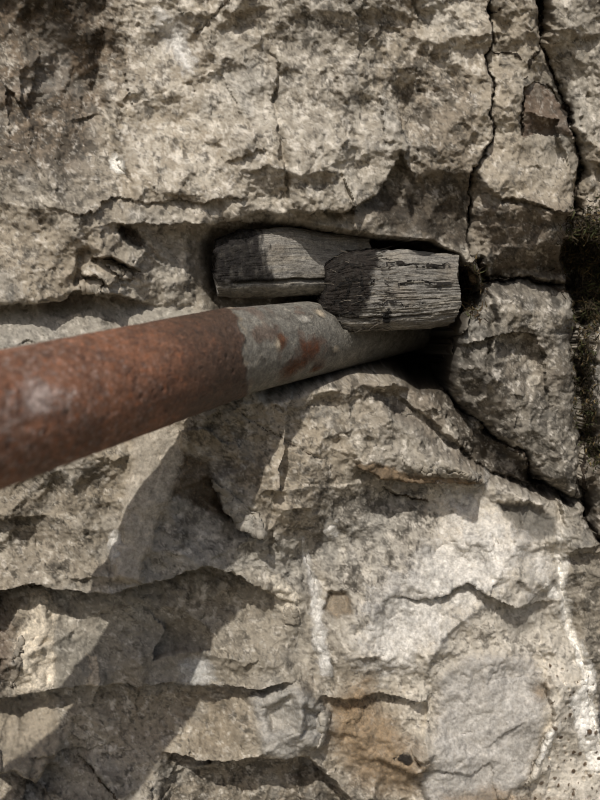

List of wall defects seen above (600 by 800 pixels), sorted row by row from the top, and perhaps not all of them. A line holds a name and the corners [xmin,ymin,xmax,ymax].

crack [466,0,584,293]
crack [438,304,600,542]
crack [77,753,118,800]